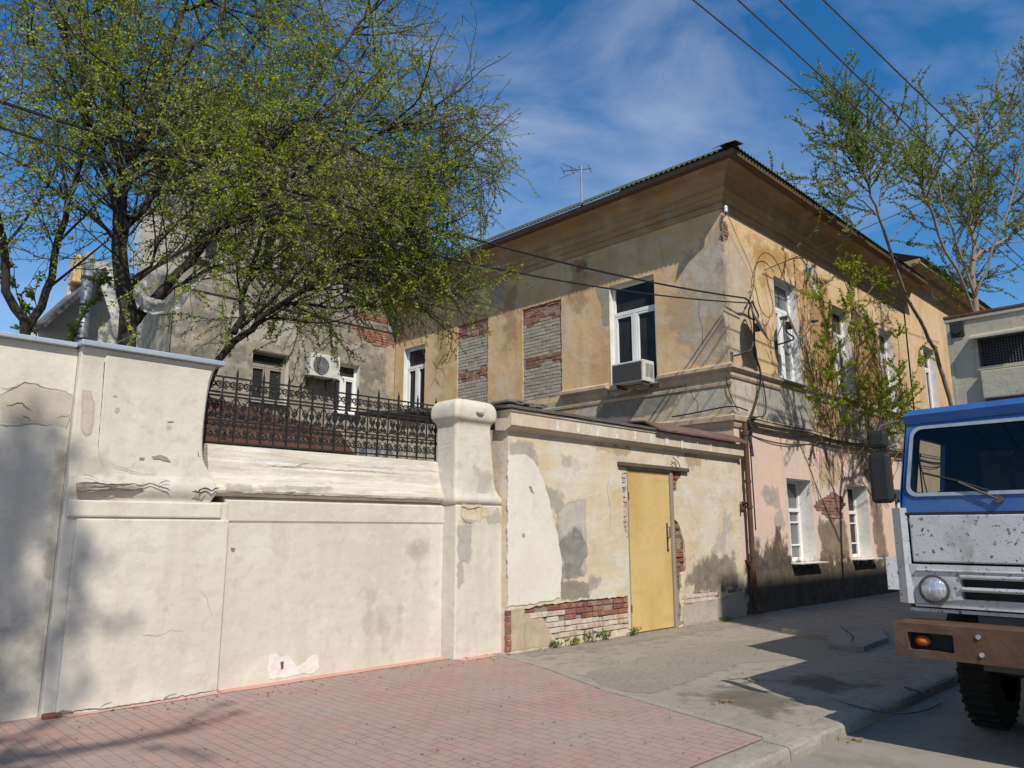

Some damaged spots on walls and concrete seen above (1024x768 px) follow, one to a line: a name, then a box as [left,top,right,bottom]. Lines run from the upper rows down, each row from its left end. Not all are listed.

flaking render [350,307,396,397]
crack [0,382,70,428]
crack [88,362,437,500]
peeling [458,454,629,652]
flaking render [675,521,742,625]
flaking render [814,450,849,561]
peeling [267,653,319,679]